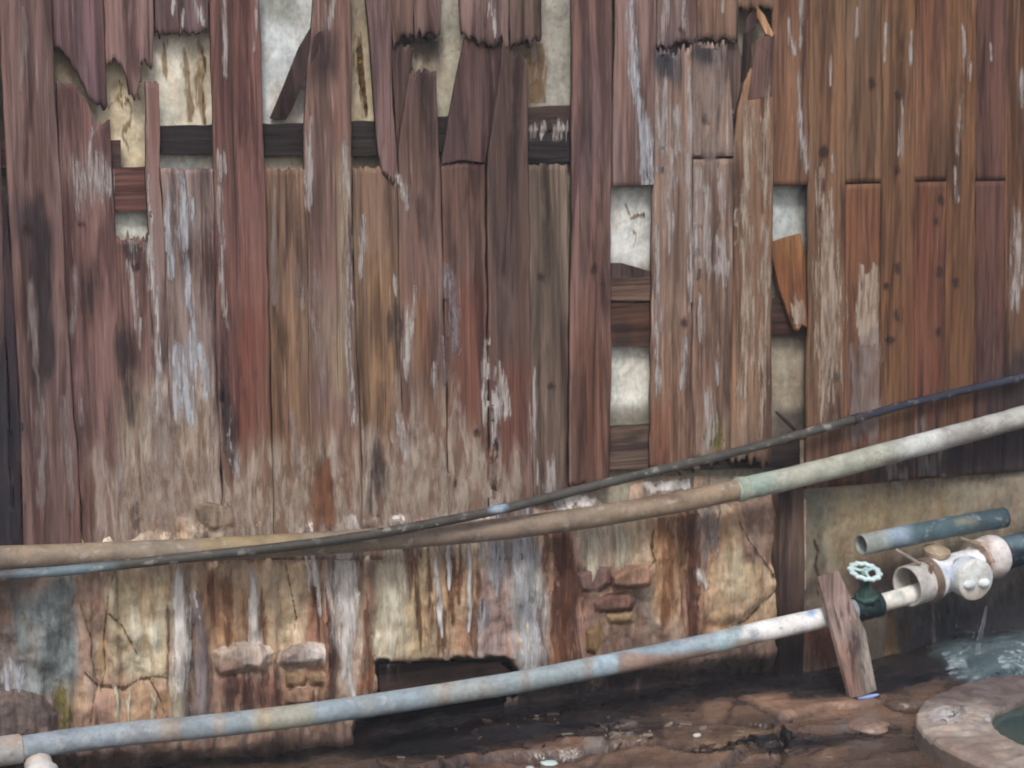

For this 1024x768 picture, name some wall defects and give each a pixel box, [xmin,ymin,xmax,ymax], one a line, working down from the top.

damp [1,657,24,693]
crack [81,576,169,724]
damp [169,565,209,718]
damp [304,553,360,697]
damp [467,536,547,671]